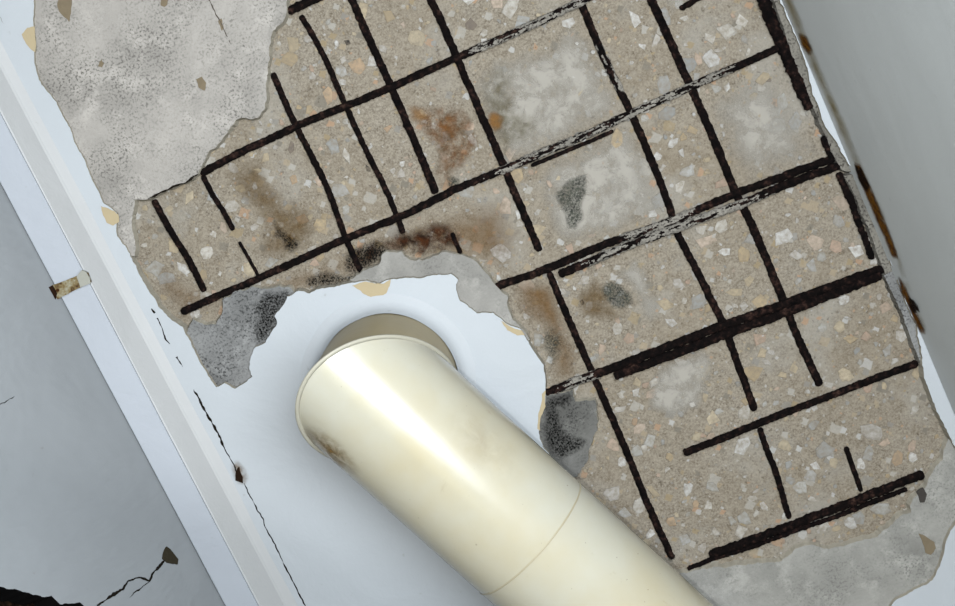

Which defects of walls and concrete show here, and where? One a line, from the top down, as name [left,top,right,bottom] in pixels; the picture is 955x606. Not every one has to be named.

corrosion [800,35,811,53]
corrosion [415,112,471,169]
spalling [22,0,779,389]
water stain [551,140,651,234]
corrosion [855,164,897,257]
water stain [308,243,385,285]
crack [151,309,182,365]
water stain [256,292,288,341]
spalling [495,0,955,606]
water stain [546,397,584,456]
crack [194,391,306,606]
crack [97,546,178,606]